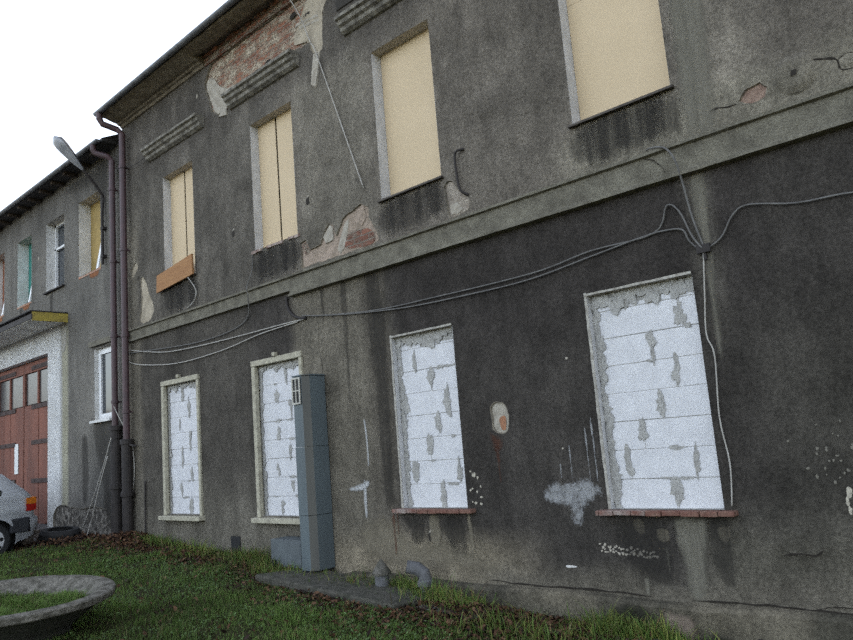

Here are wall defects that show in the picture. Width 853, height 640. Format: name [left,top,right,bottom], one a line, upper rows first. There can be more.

spalling [196,0,326,117]
crack [814,52,853,70]
spalling [299,203,379,269]
spalling [490,402,509,434]
crack [782,549,824,557]
crack [494,580,651,597]
crack [693,600,853,615]